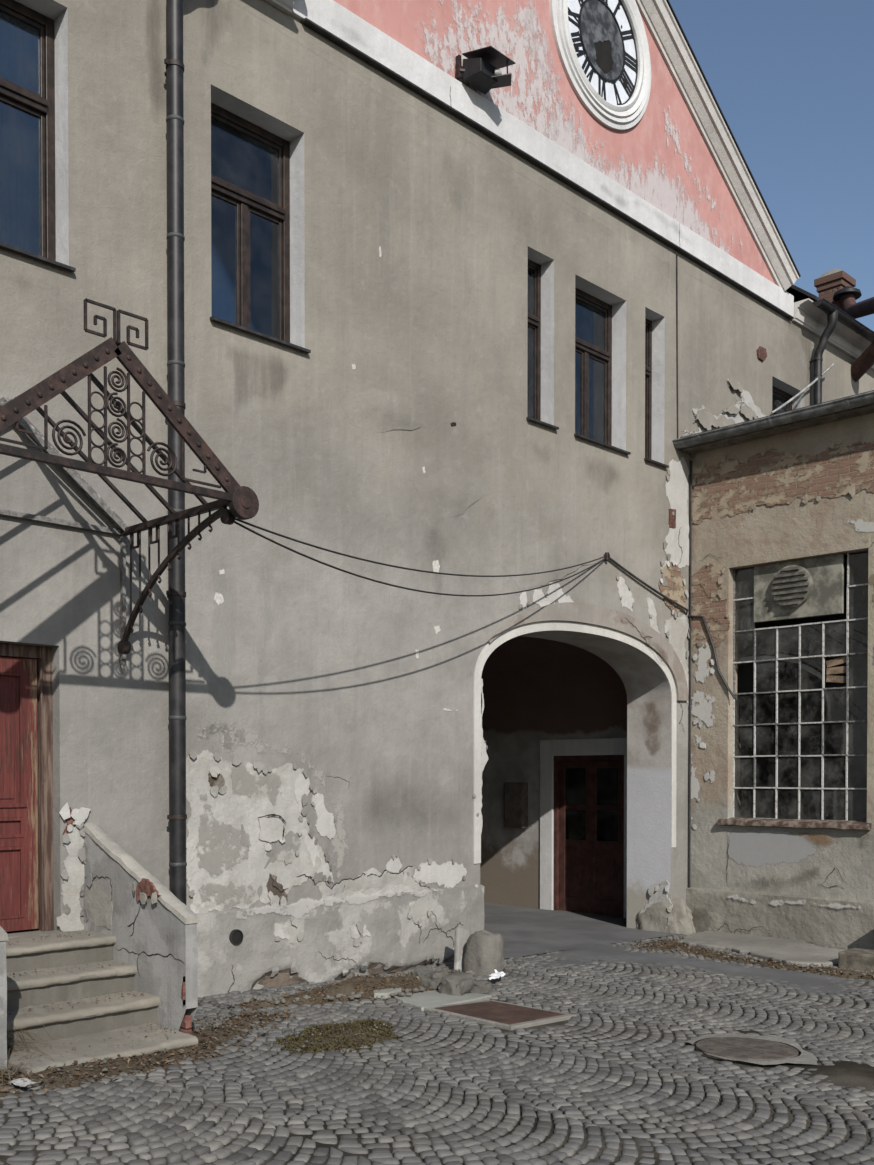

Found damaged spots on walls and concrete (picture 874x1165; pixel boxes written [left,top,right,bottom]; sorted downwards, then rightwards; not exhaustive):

peeling [421,0,742,254]
flaking render [679,377,766,438]
peeling [519,582,574,610]
flaking render [616,439,874,802]
spalling [56,802,113,932]
flaking render [132,878,161,904]
flaking render [186,722,467,947]
crack [120,904,183,976]
spalling [251,960,309,989]
spalling [331,955,454,981]